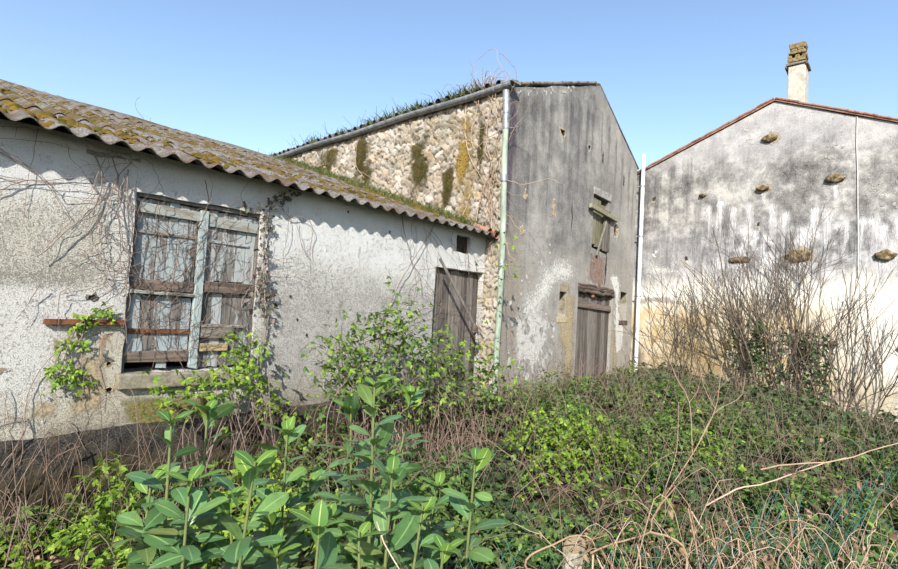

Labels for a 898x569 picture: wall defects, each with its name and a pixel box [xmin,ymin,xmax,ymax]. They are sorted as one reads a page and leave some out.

leakage [705,201,753,242]
leakage [761,192,790,246]
leakage [808,207,833,244]
leakage [843,216,898,295]
peeling [507,243,575,384]
peeling [587,252,624,368]